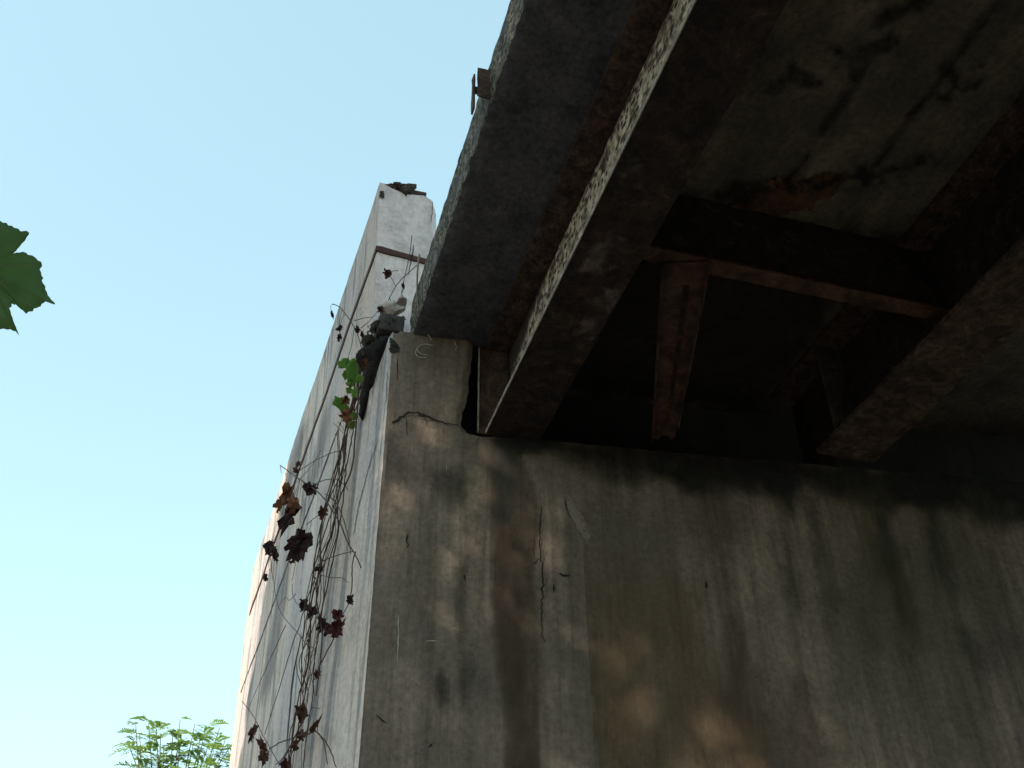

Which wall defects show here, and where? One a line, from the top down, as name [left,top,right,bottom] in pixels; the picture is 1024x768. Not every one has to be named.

crack [354,358,459,532]
crack [533,506,546,642]